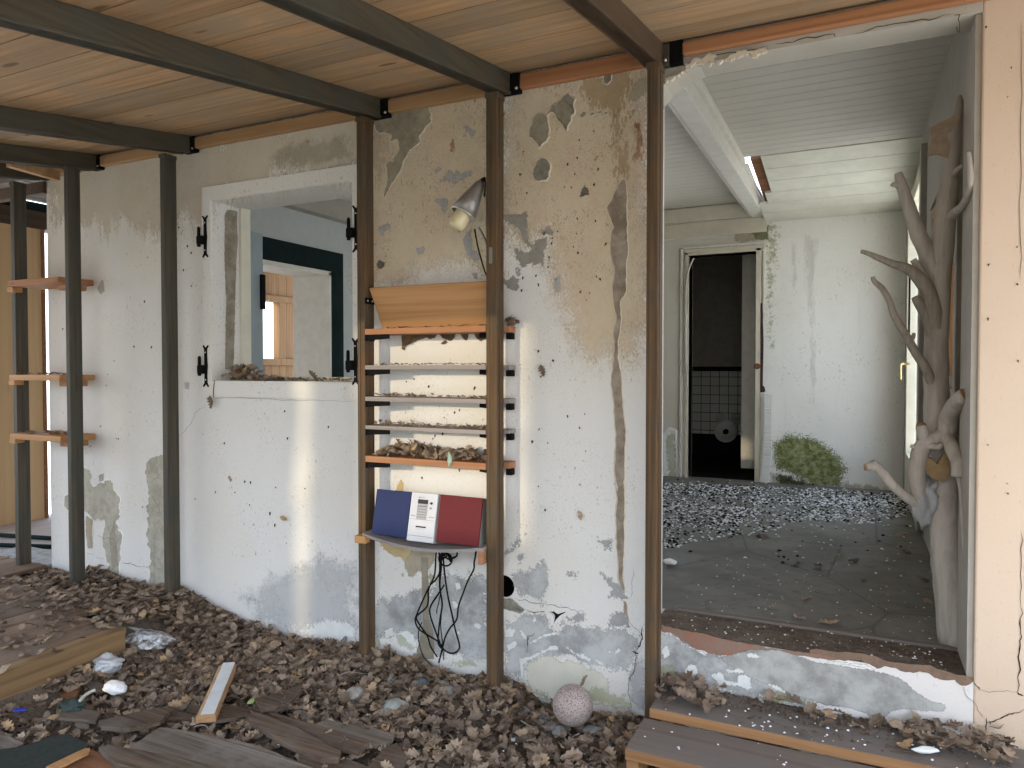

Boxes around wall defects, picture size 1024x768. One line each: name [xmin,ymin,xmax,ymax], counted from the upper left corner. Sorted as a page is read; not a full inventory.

spalling [665,47,768,84]
spalling [374,107,432,199]
spalling [528,92,608,182]
peeling [504,211,553,291]
leakage [504,68,647,359]
spalling [84,466,124,575]
spalling [144,453,164,585]
leakage [300,617,357,644]
crack [519,599,584,647]
peeling [661,625,973,717]
crack [964,534,1024,729]